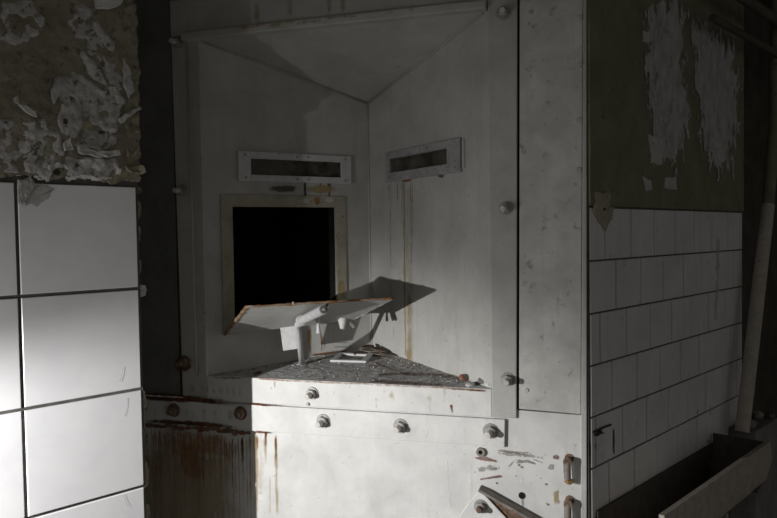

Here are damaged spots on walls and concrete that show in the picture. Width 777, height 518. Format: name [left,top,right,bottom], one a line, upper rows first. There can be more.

peeling [0,0,146,182]
peeling [642,0,743,190]
corrosion [145,431,277,518]